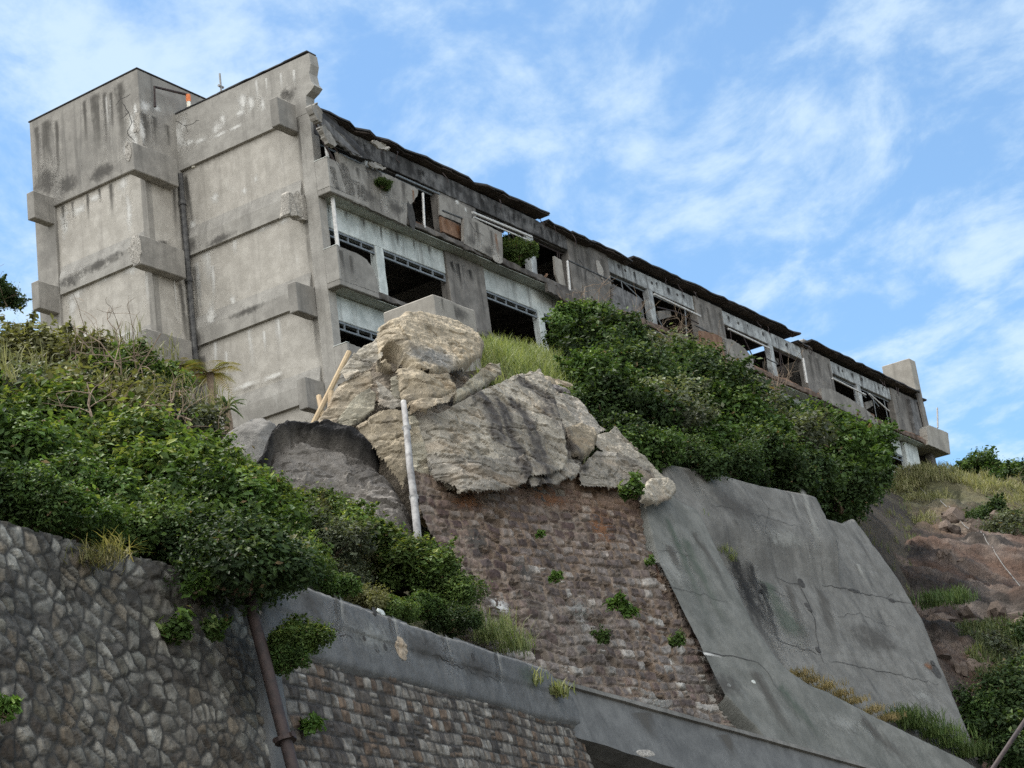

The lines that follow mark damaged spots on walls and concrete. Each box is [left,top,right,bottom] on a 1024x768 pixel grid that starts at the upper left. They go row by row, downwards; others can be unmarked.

water stain [35,122,58,151]
water stain [83,84,203,149]
water stain [40,166,132,233]
water stain [733,559,775,626]
crack [757,577,934,684]
crack [683,649,776,686]